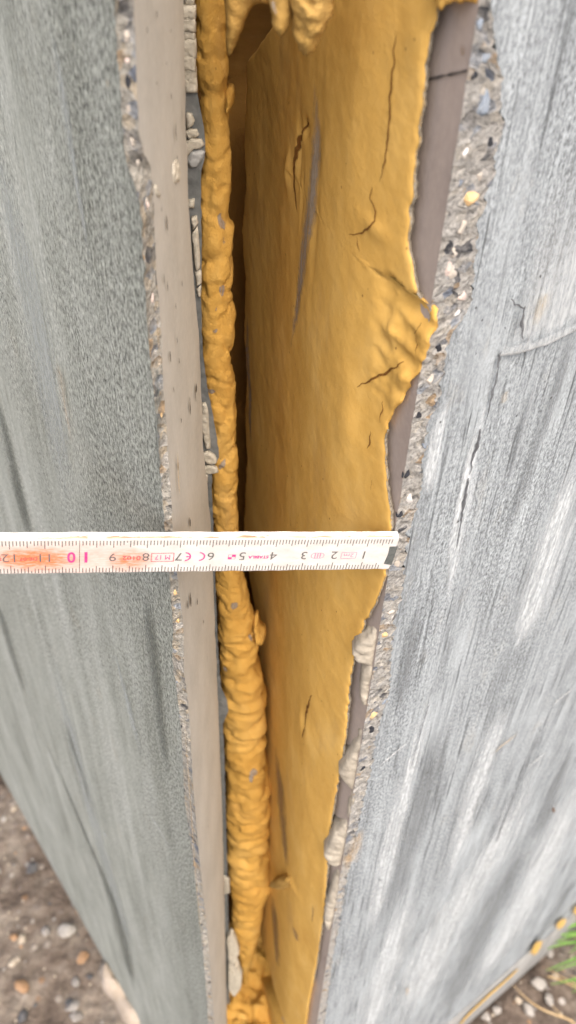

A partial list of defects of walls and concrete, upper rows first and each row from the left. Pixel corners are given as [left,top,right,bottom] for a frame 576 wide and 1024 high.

crack [293,118,309,209]
crack [351,36,396,249]
crack [358,324,421,387]